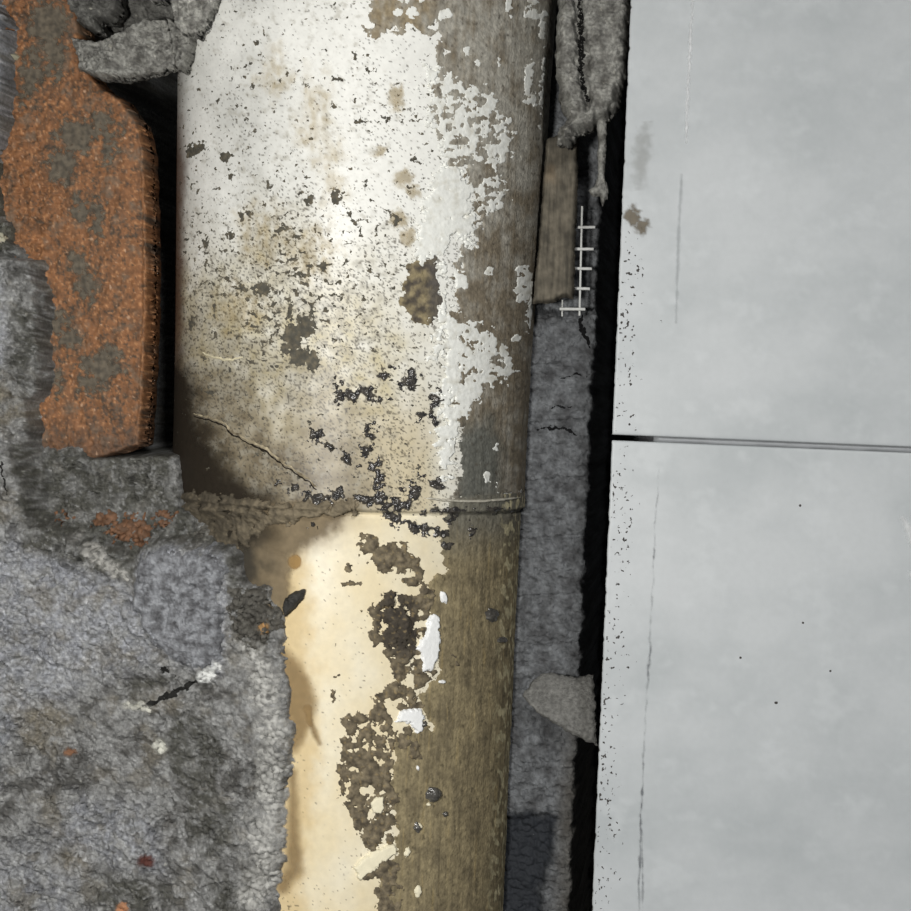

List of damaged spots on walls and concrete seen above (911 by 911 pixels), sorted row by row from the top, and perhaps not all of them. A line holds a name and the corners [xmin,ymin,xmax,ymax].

peeling [393,0,425,19]
peeling [435,8,453,21]
peeling [522,0,549,135]
peeling [398,61,533,482]
crack [202,352,243,361]
damp [172,366,266,512]
crack [194,413,317,490]
peeling [416,614,441,673]
peeling [394,708,425,734]
peeling [371,797,384,814]
peeling [353,844,411,881]